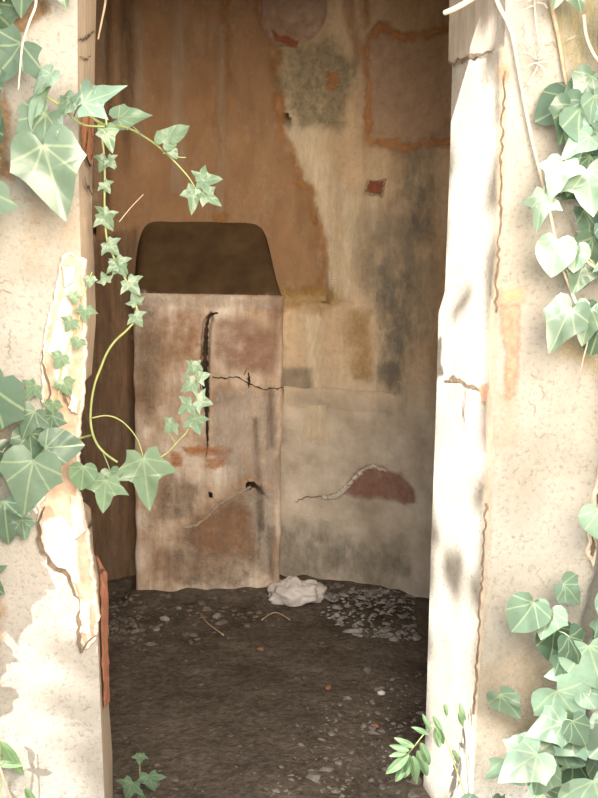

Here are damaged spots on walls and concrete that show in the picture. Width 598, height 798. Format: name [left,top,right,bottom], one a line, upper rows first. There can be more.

spalling [81,116,94,164]
spalling [493,71,520,398]
spalling [40,251,88,438]
crack [200,312,282,456]
spalling [37,452,110,708]
spalling [297,464,415,503]
spalling [585,533,598,567]